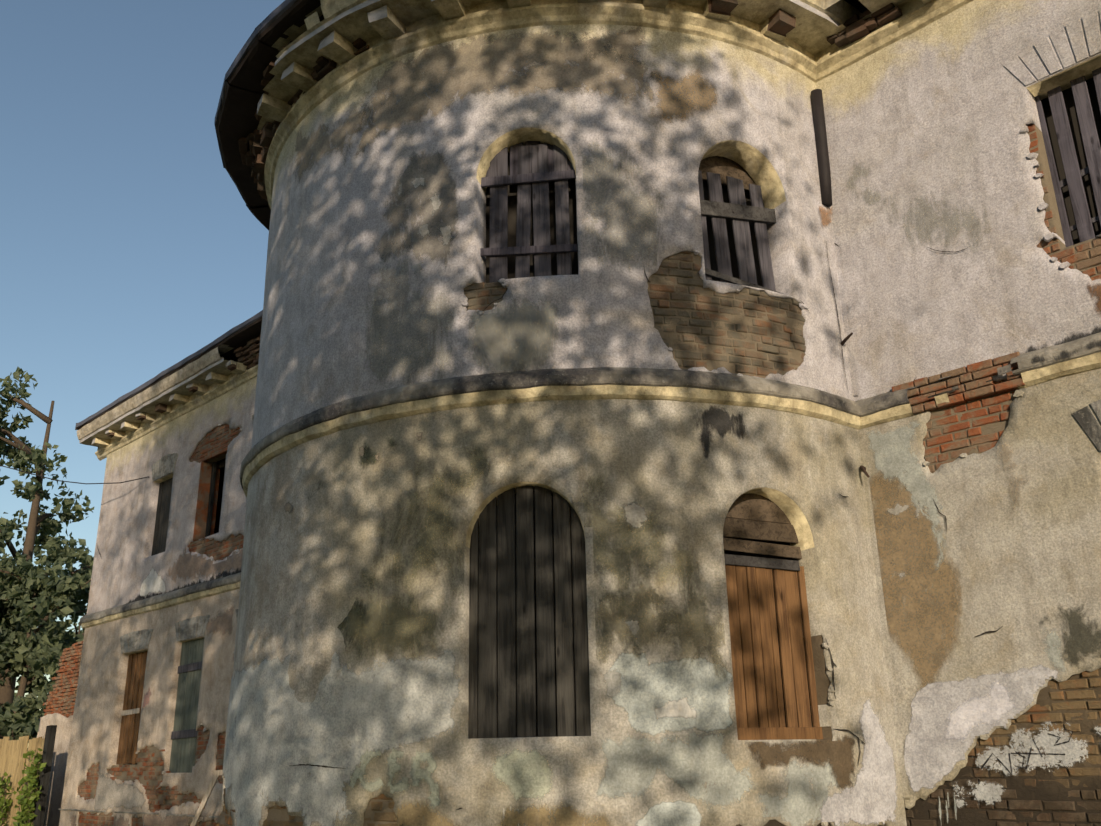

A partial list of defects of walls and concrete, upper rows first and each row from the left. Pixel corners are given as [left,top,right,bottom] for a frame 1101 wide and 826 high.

leakage [295,25,716,180]
leakage [379,152,458,263]
flaking render [1020,124,1101,281]
flaking render [647,250,808,378]
flaking render [892,351,1025,473]
flaking render [43,641,83,718]
leakage [337,601,435,653]
leakage [585,480,725,671]
leakage [870,473,961,688]
leakage [1060,607,1101,664]
flaking render [77,723,236,826]
flaking render [904,668,1101,826]